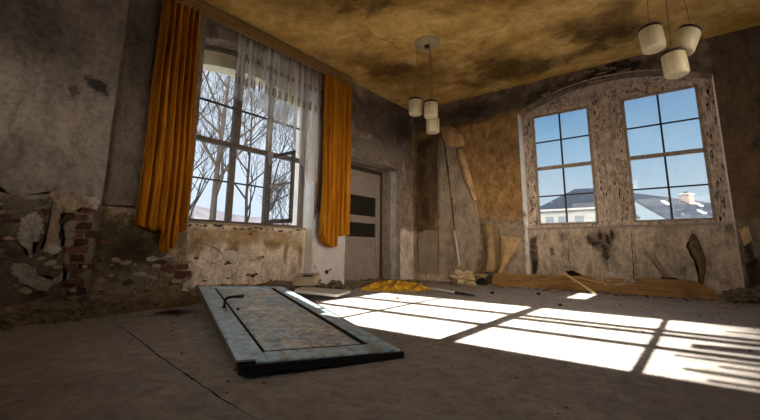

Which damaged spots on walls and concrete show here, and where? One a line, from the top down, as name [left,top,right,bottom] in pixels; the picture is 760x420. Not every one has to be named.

water stain [84,76,108,95]
water stain [438,90,521,125]
water stain [460,2,642,87]
spalling [9,196,199,300]
water stain [587,231,614,259]
crack [114,321,255,419]